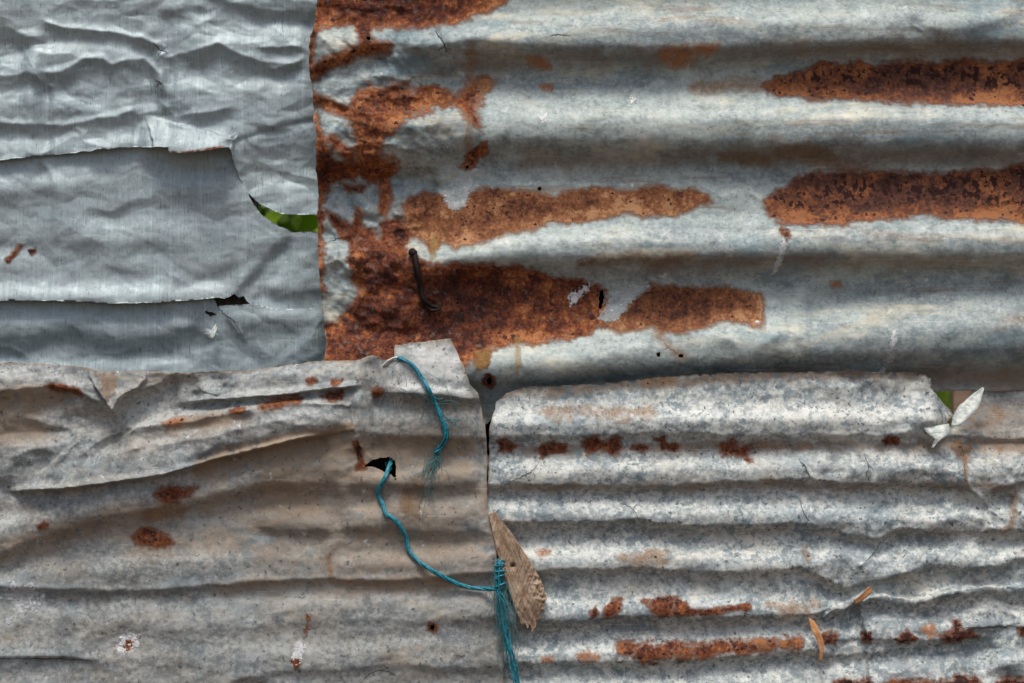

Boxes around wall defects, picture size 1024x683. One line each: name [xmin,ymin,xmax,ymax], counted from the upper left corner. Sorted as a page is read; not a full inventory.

corrosion [762,57,1024,107]
corrosion [309,0,765,389]
corrosion [763,162,1024,239]
corrosion [306,376,344,402]
corrosion [538,440,568,459]
corrosion [581,431,679,455]
corrosion [720,439,752,463]
corrosion [131,527,175,548]
corrosion [641,595,752,618]
corrosion [615,634,805,665]
corrosion [860,631,873,644]
corrosion [894,619,978,645]